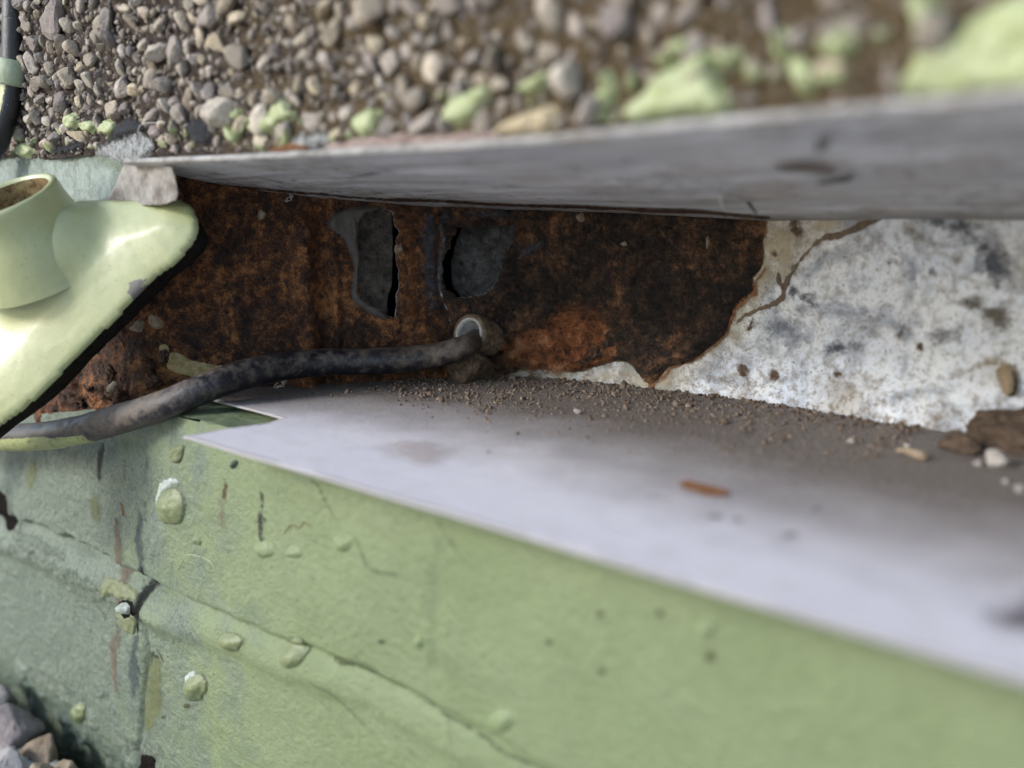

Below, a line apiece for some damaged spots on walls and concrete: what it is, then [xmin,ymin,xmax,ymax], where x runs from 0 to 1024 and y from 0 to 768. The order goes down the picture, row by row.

peeling [326,205,386,320]
rust [32,176,838,422]
crack [736,219,882,324]
peeling [980,359,1019,397]
crack [133,566,159,634]